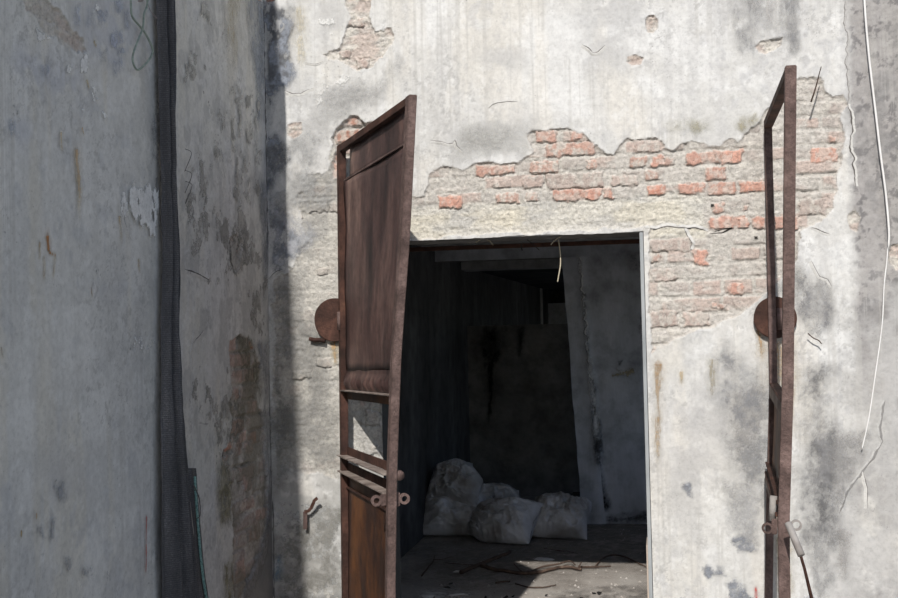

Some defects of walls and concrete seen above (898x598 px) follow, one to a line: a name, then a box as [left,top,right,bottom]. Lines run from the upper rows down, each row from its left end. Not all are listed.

spalling [23,0,88,73]
peeling [121,178,160,242]
peeling [186,79,262,284]
damp [248,0,296,119]
spalling [316,0,394,105]
flaking render [410,103,784,354]
flaking render [795,76,848,263]
crack [843,0,858,186]
flaking render [192,115,383,598]
crack [838,400,885,514]